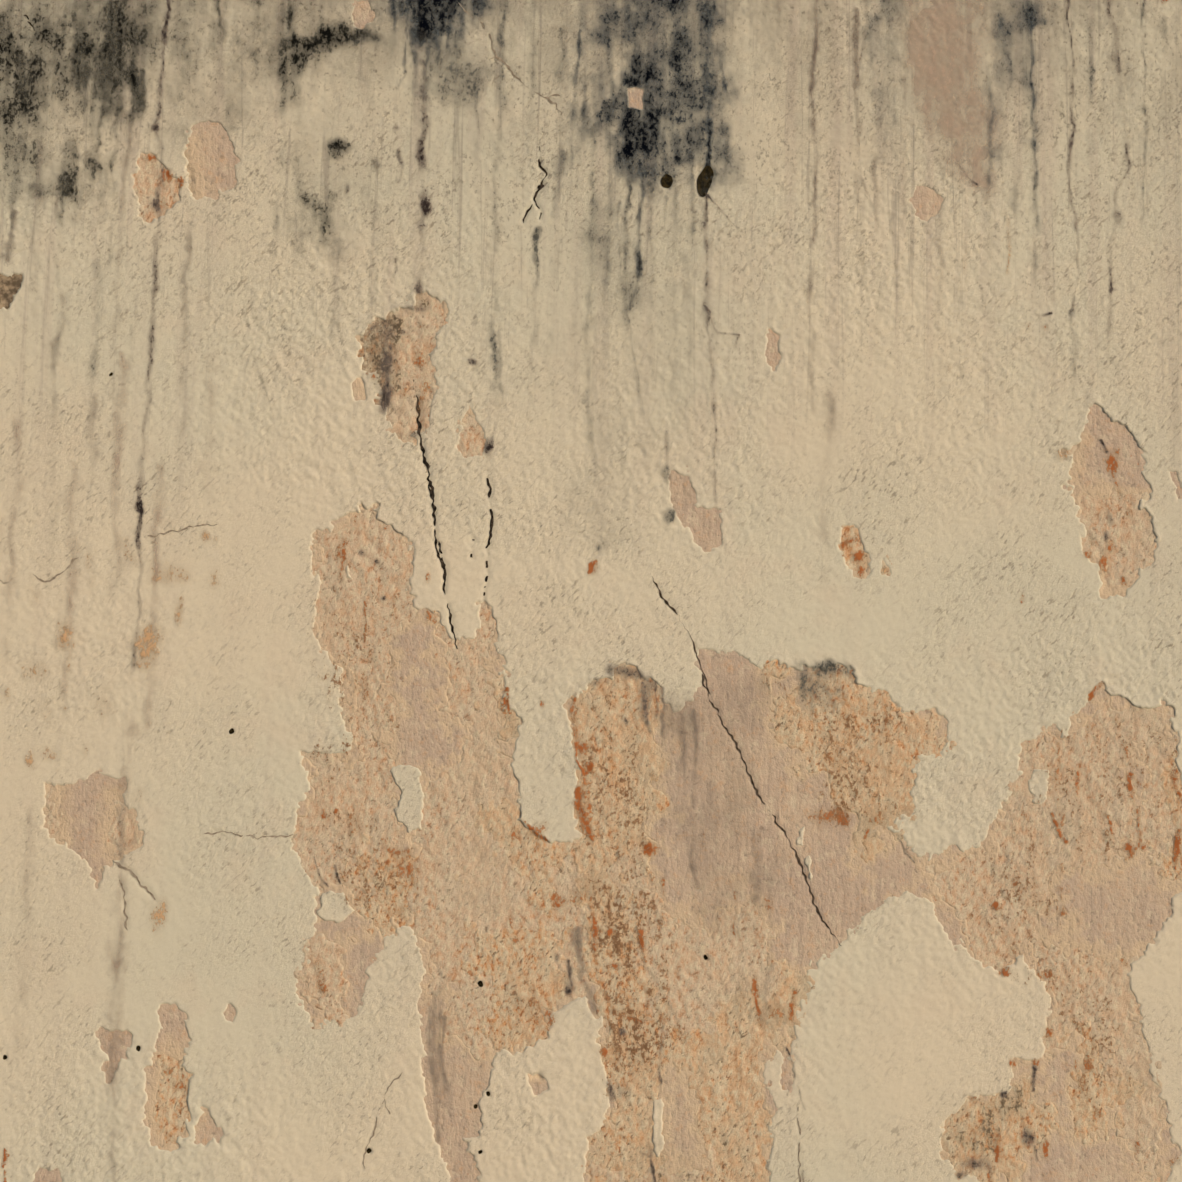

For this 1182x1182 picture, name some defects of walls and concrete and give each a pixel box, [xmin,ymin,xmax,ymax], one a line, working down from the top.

damp [0,0,196,228]
damp [252,0,381,107]
damp [389,0,490,168]
damp [560,0,731,322]
spalling [0,274,23,309]
peeling [352,287,449,445]
damp [135,486,158,580]
crack [413,380,494,649]
peeling [1056,391,1162,599]
peeling [291,495,1182,1182]
crack [653,580,841,946]
peeling [143,1004,223,1152]